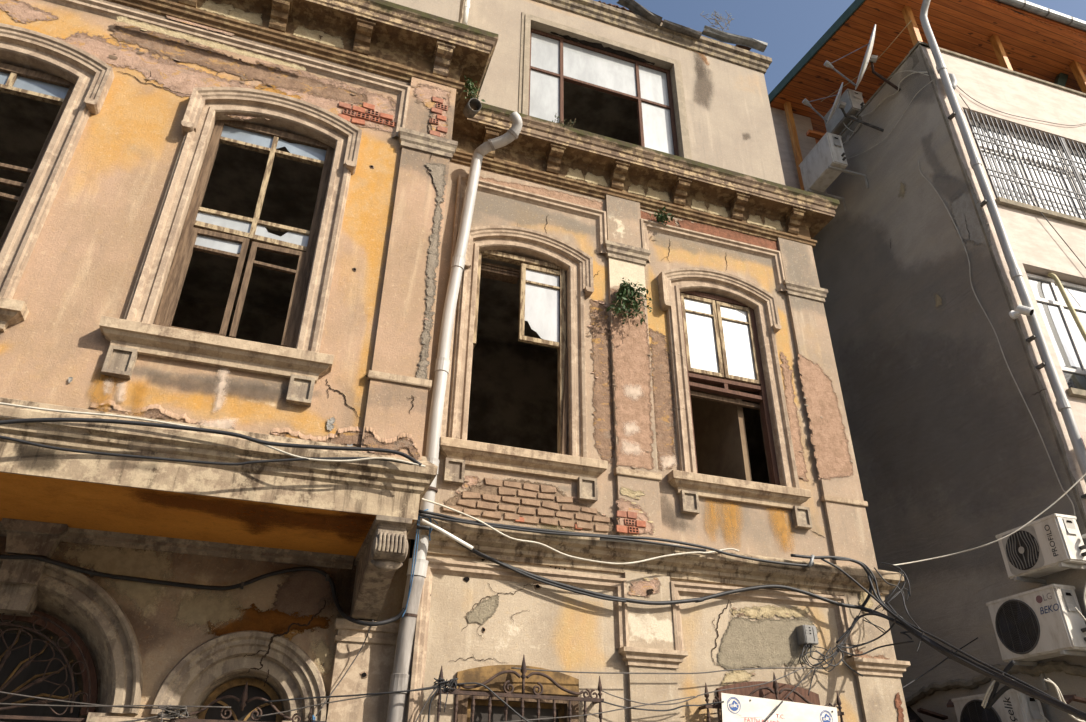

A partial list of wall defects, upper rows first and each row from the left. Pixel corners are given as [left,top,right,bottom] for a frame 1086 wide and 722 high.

peeling [198,0,262,26]
peeling [57,16,398,134]
damp [695,51,711,106]
crack [326,379,361,418]
spalling [780,352,854,482]
damp [19,424,88,467]
damp [129,441,175,451]
damp [135,491,376,541]
flaking render [442,475,656,536]
flaking render [207,566,335,640]
spalling [730,604,810,619]
crack [244,600,326,686]